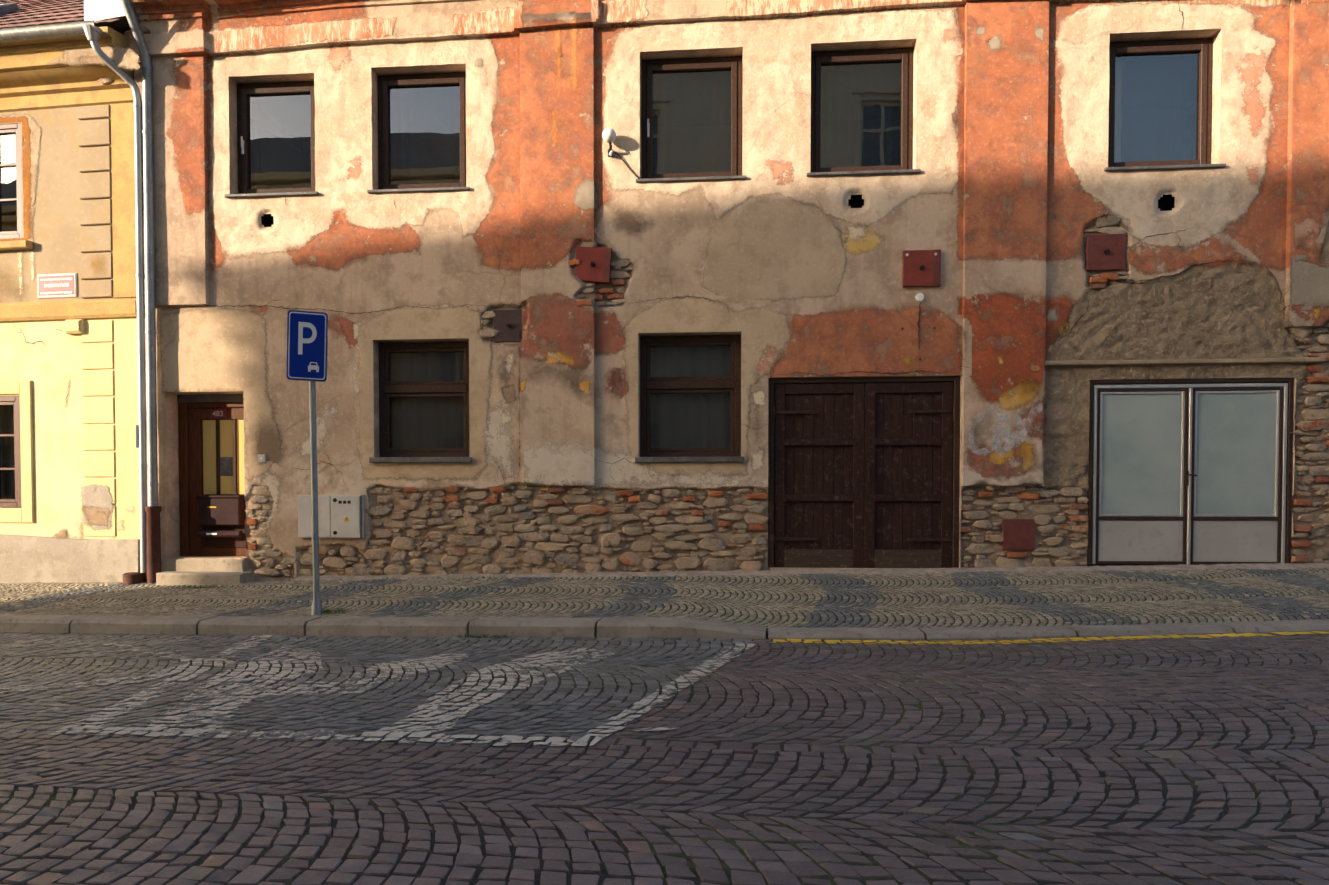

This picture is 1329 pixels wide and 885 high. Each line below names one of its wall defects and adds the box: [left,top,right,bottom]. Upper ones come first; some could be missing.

peeling [47,0,365,270]
peeling [287,209,421,271]
peeling [474,0,643,399]
peeling [753,0,1329,568]
spalling [53,485,135,539]